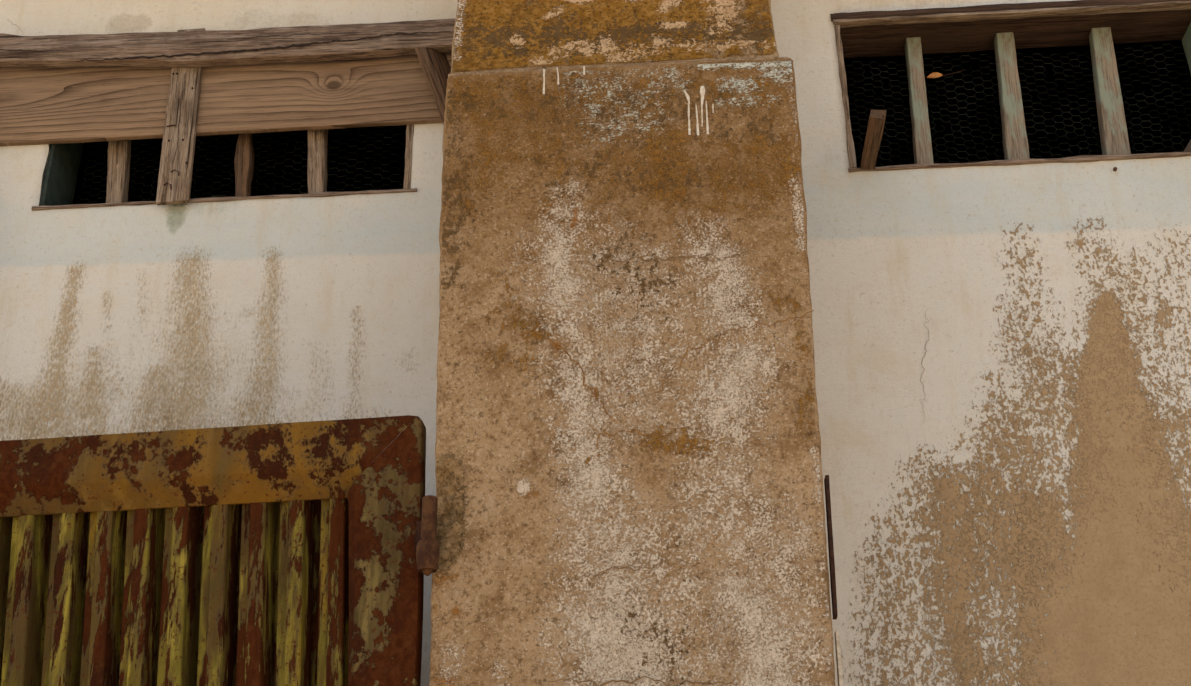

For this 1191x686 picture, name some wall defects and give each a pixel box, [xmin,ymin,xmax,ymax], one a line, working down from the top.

water stain [441,67,786,298]
water stain [582,224,687,321]
crack [581,253,747,288]
water stain [0,250,218,441]
water stain [224,254,281,425]
crack [515,330,658,449]
crack [646,301,814,399]
crack [580,561,682,578]
crack [534,676,733,686]
water stain [616,596,695,686]